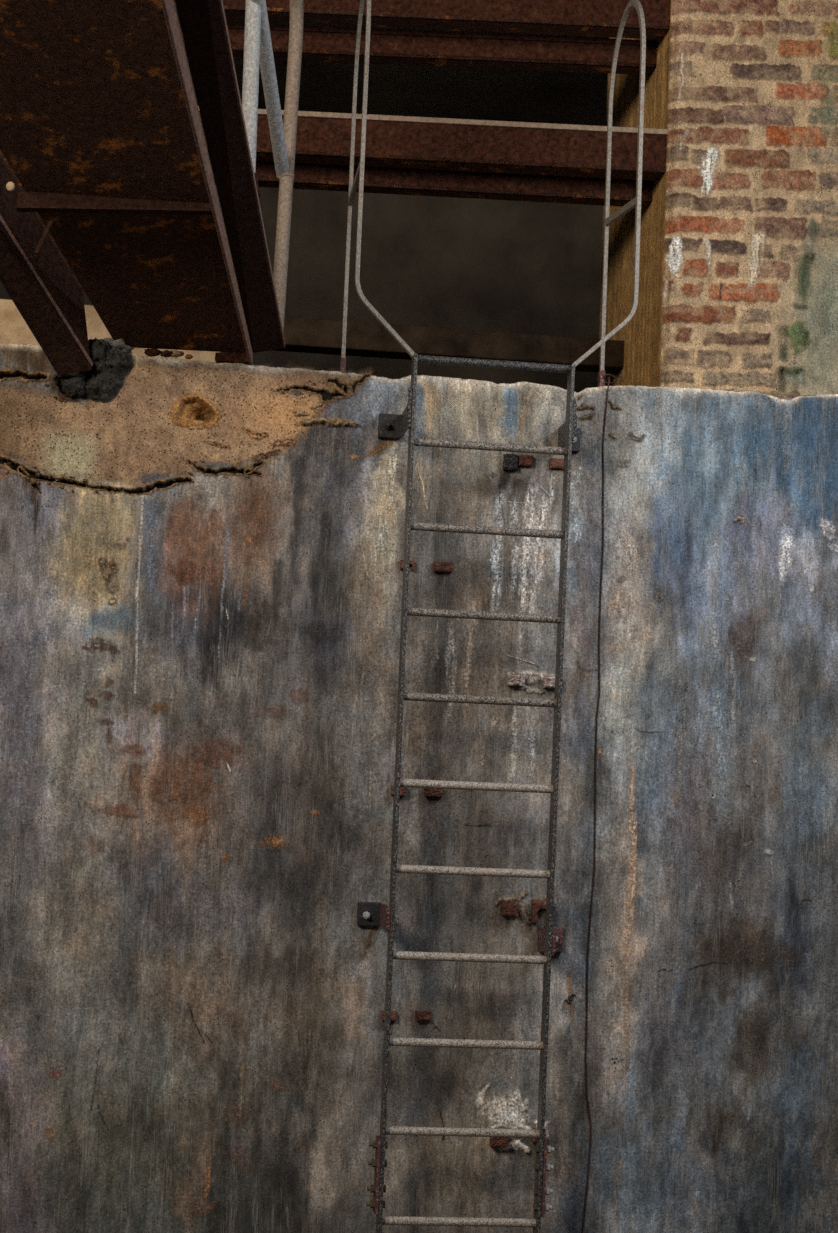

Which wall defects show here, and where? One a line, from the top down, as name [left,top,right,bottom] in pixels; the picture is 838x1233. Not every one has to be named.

damp [697,147,718,194]
damp [663,237,682,297]
damp [748,232,764,287]
peeling [0,361,363,486]
peeling [71,504,128,605]
damp [218,456,305,657]
damp [360,455,399,576]
damp [778,529,795,580]
damp [819,519,838,552]
damp [171,587,201,648]